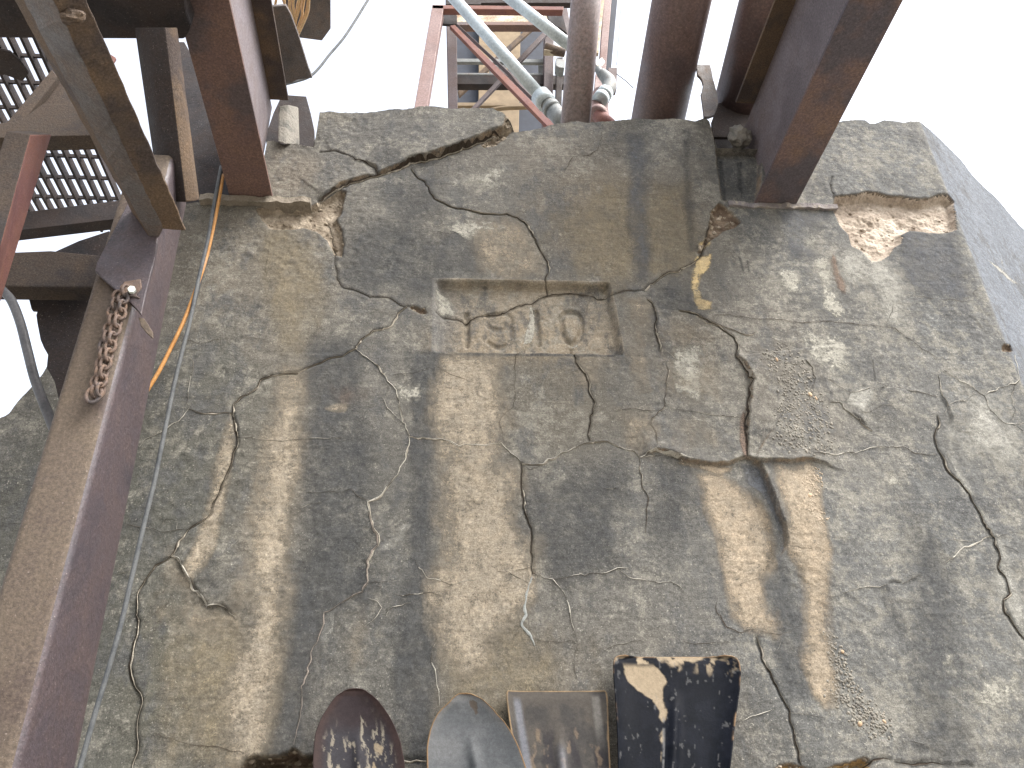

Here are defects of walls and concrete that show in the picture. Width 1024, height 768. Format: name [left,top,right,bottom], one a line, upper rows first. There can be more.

spalling [257,191,346,257]
spalling [692,204,740,310]
spalling [834,192,957,262]
crack [114,130,1024,768]
damp [699,462,837,706]